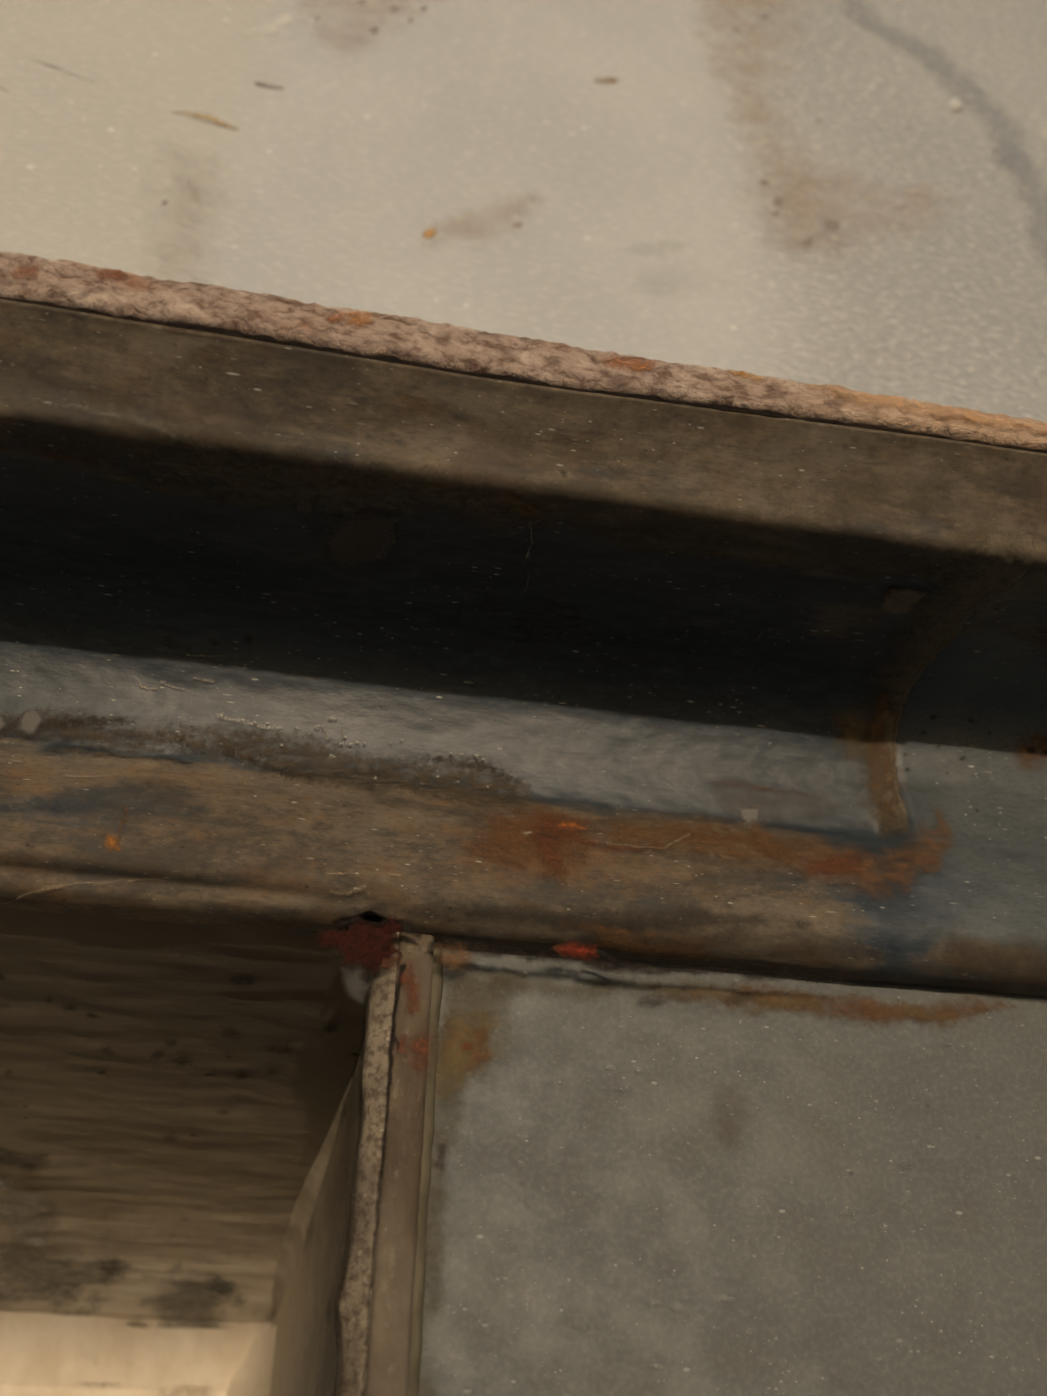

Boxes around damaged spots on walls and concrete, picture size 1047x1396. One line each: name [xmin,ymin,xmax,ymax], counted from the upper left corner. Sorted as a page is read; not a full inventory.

corrosion [100,269,123,279]
corrosion [675,986,1005,1023]
water stain [143,1277,232,1329]